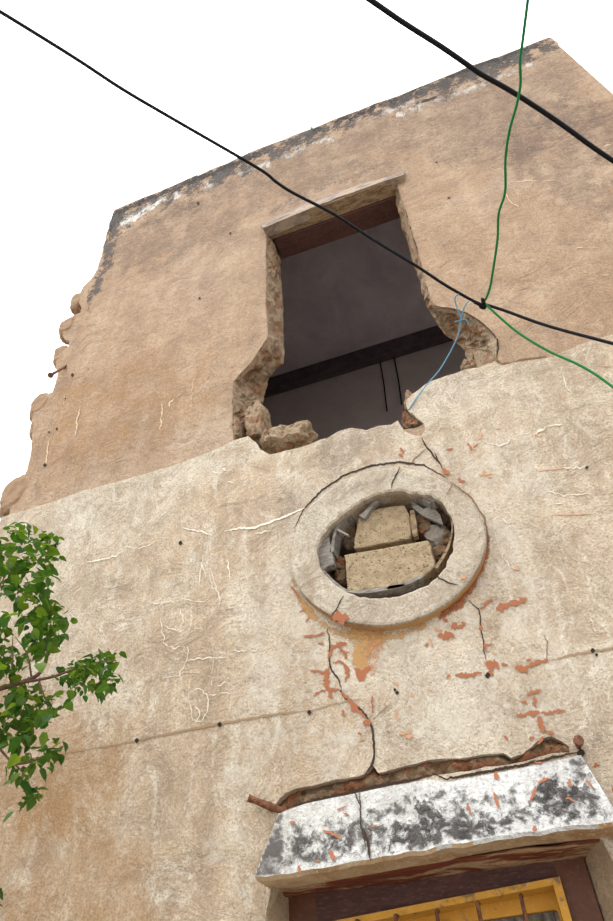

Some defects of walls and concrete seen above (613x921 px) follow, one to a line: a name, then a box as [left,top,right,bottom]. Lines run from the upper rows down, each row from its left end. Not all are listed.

water stain [87,38,560,312]
spalling [395,185,498,371]
spalling [229,234,318,454]
spalling [402,390,421,430]
crack [294,437,513,568]
crack [33,565,577,860]
spalling [330,610,350,625]
spalling [308,658,385,703]
rust [292,535,490,675]
spalling [406,606,552,689]
spalling [480,557,554,641]
mould [255,758,610,876]